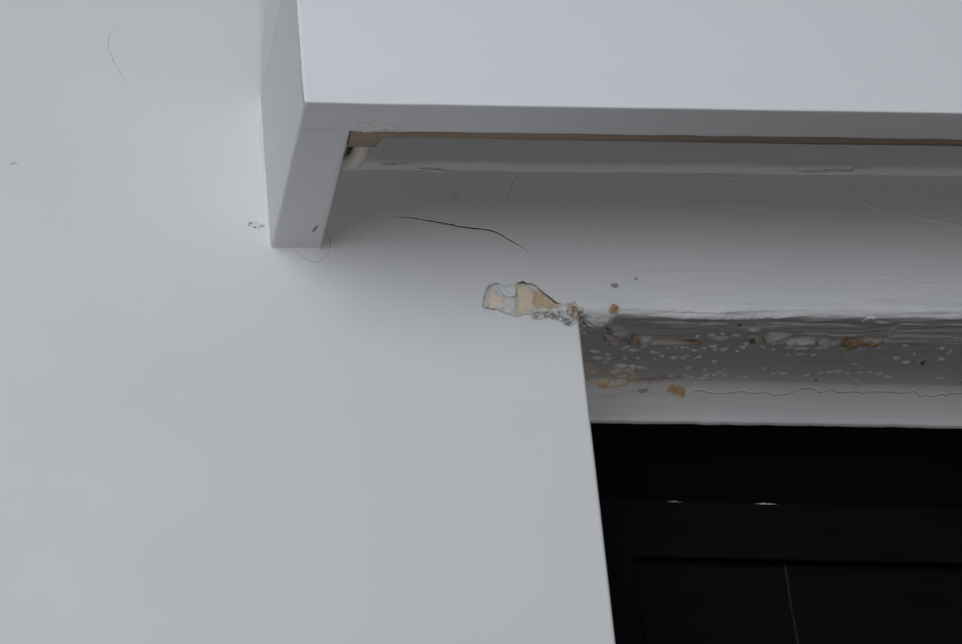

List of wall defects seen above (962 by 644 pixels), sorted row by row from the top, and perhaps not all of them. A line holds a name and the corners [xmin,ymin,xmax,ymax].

crack [391,215,532,254]
peeling [483,281,584,326]
crack [687,386,962,397]